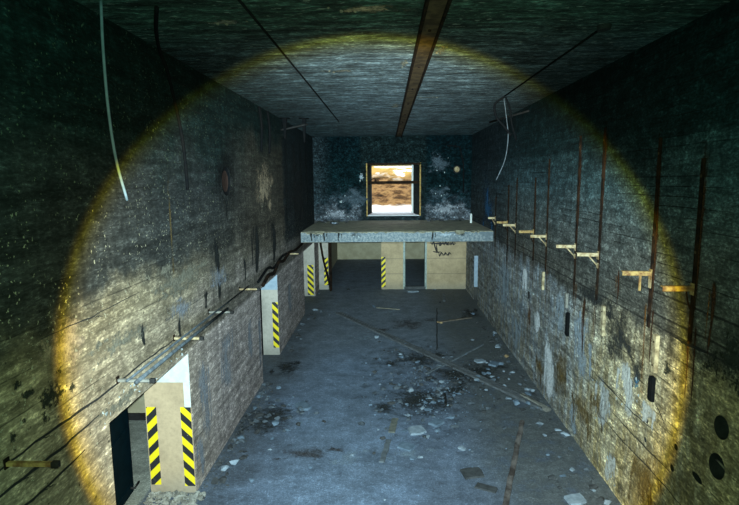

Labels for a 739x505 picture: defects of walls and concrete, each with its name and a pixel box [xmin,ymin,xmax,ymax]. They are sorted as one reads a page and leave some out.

rust [641,165,661,379]
water stain [13,368,75,423]